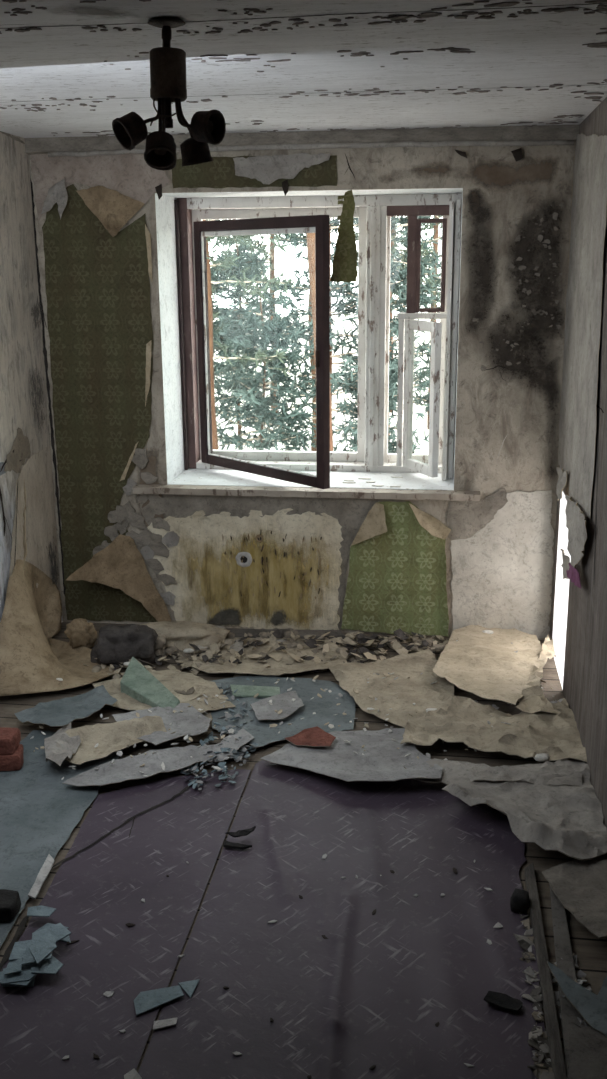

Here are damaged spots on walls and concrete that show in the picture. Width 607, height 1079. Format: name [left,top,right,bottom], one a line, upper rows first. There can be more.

peeling [2,0,47,16]
peeling [176,0,354,34]
peeling [368,0,607,25]
peeling [191,53,296,72]
peeling [381,47,475,67]
peeling [279,79,607,102]
peeling [0,96,138,112]
water stain [412,164,451,175]
water stain [464,160,565,431]
flaking render [0,427,31,476]
peeling [93,448,378,630]
peeling [446,466,587,639]